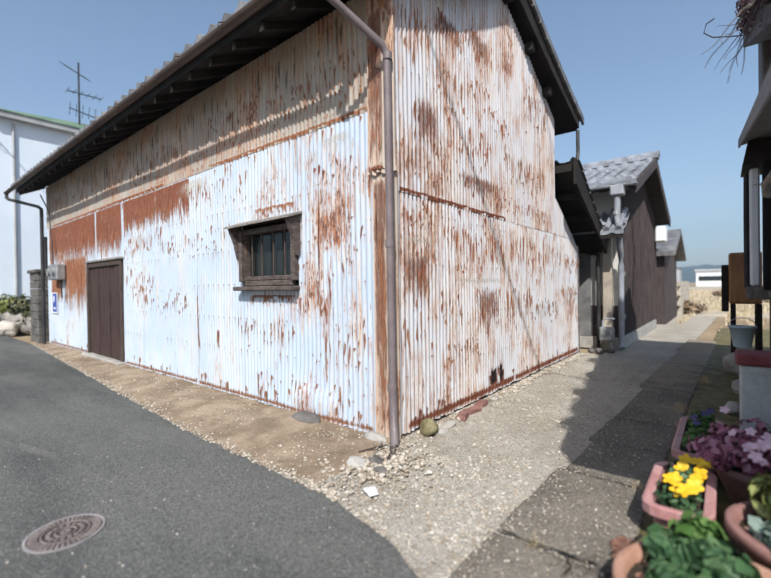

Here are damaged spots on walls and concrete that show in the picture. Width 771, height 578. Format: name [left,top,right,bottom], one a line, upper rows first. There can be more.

rust [400,7,492,70]
rust [400,71,578,280]
rust [49,10,387,432]
rust [401,249,462,357]
rust [448,337,481,363]
rust [409,348,578,428]
rust [475,288,558,336]